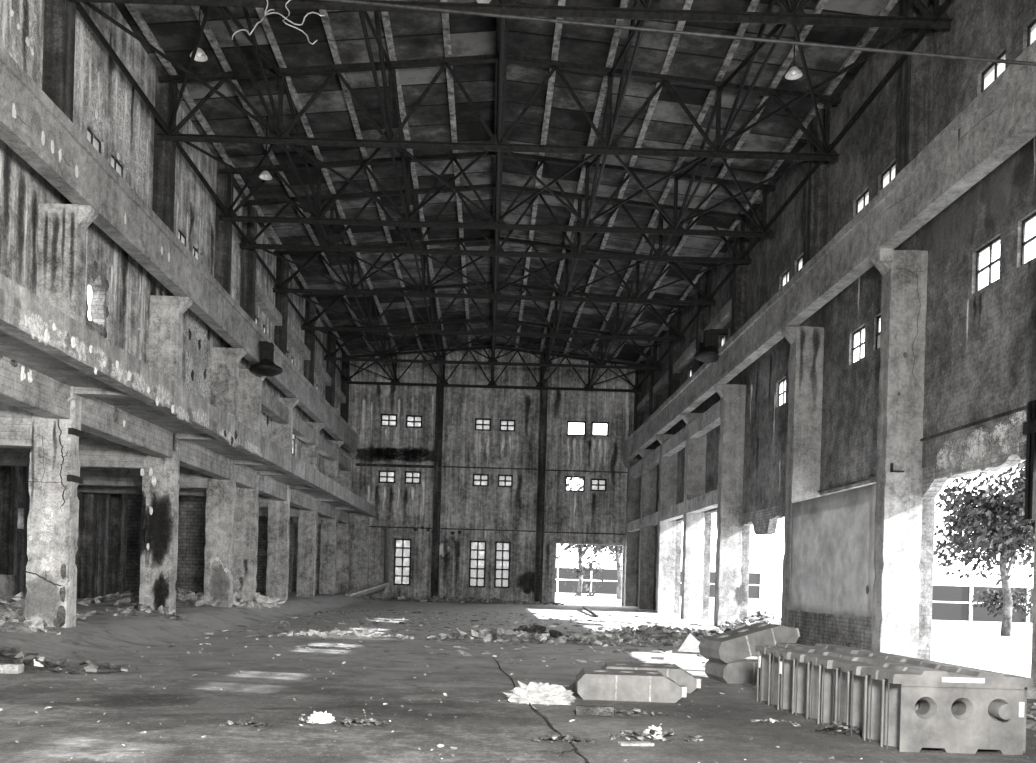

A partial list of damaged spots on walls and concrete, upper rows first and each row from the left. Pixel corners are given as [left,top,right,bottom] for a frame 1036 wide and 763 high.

spalling [922,411,1027,499]
peeling [25,505,66,627]
crack [493,658,589,763]